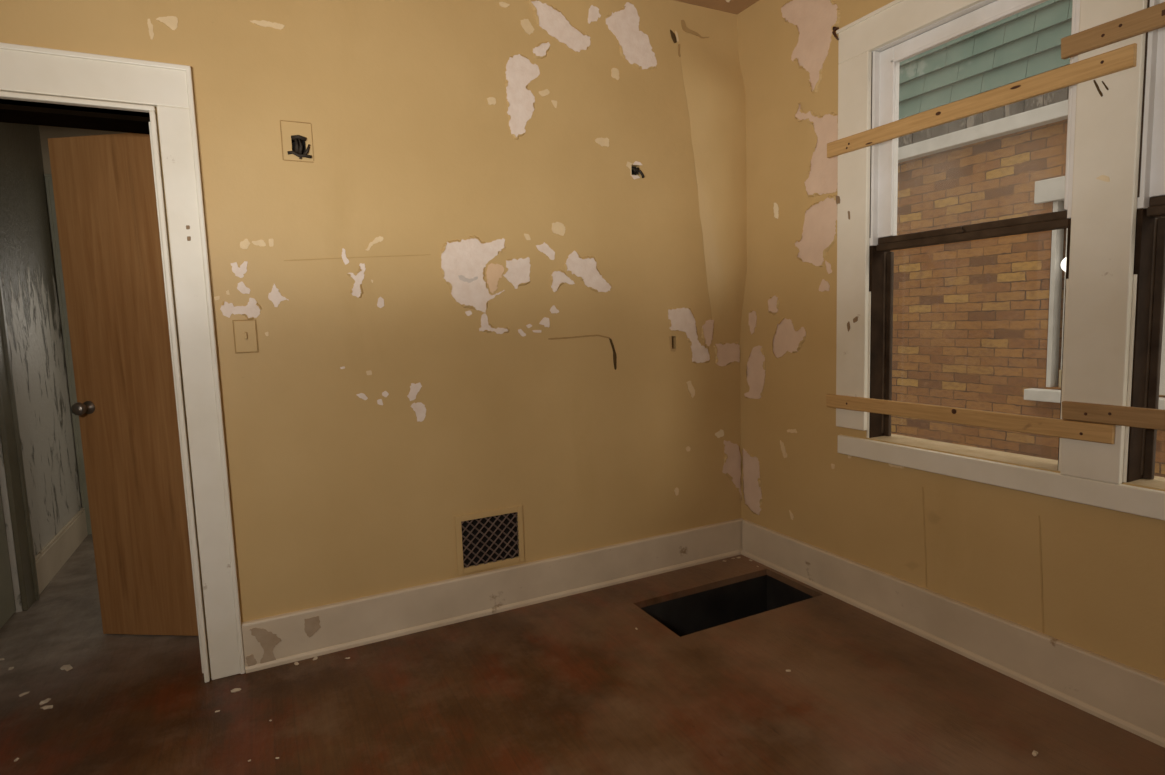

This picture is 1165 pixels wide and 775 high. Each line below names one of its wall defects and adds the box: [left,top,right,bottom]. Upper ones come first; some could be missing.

peeling [487,0,657,140]
peeling [781,0,841,93]
peeling [794,103,850,292]
peeling [214,239,289,320]
peeling [341,236,383,298]
peeling [440,222,612,337]
peeling [668,296,806,399]
peeling [715,429,763,515]
peeling [246,627,281,666]